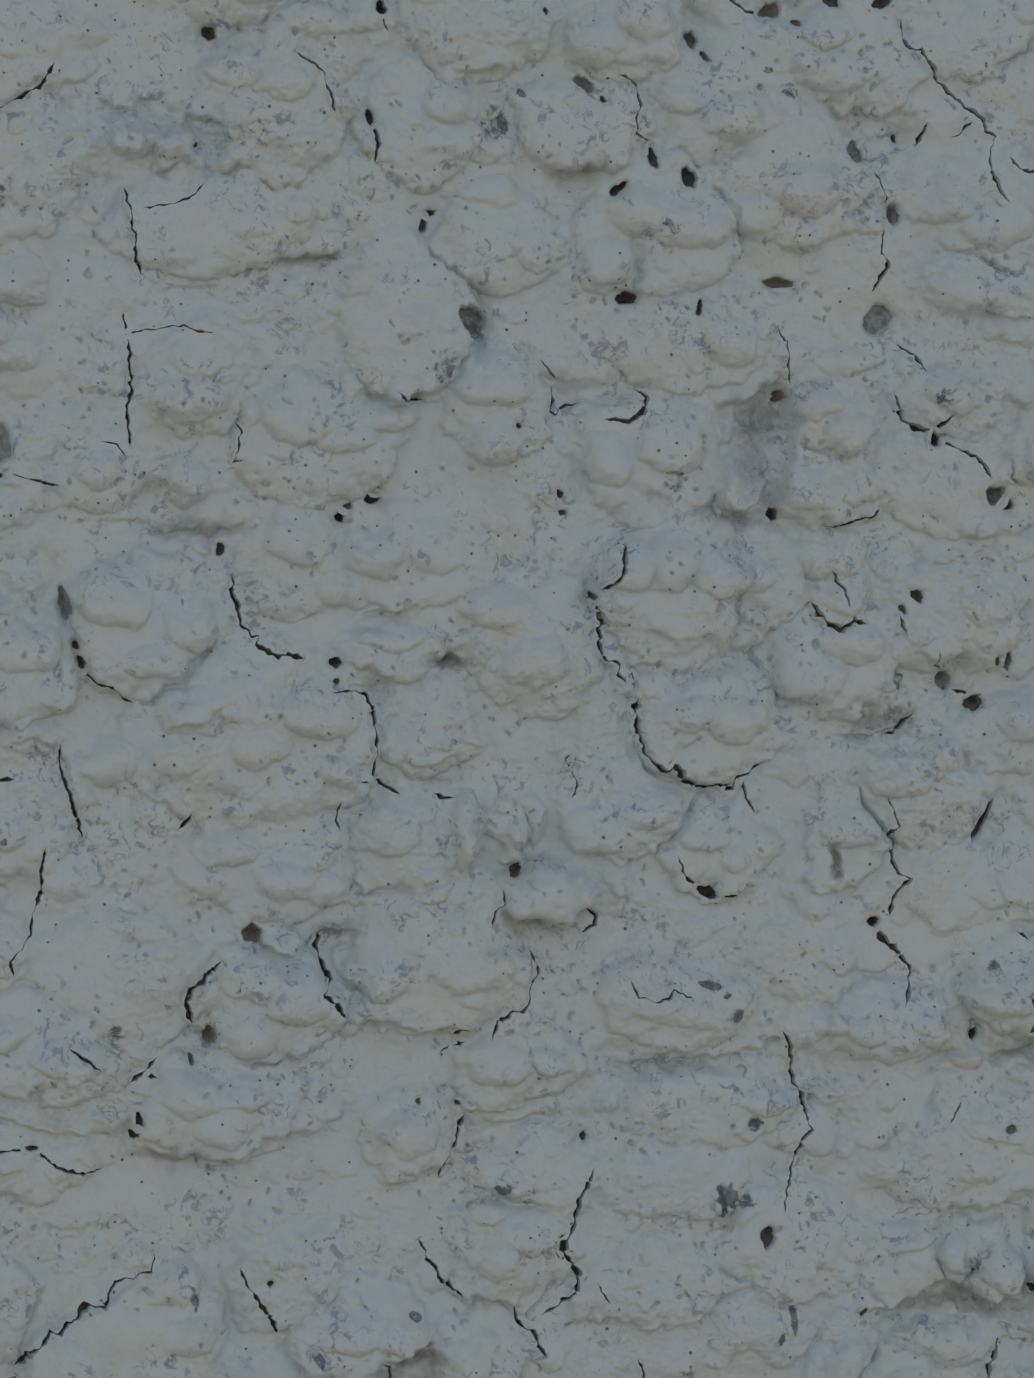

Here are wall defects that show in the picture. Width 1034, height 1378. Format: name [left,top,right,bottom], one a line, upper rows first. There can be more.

crack [896,18,1034,205]
crack [100,312,214,459]
crack [888,341,995,480]
crack [223,573,304,666]
crack [329,684,457,832]
crack [589,544,765,816]
crack [3,744,88,977]
crack [307,931,349,1021]
crack [873,796,919,1010]
crack [778,1029,819,1214]
crack [3,1251,161,1378]
crack [507,1165,614,1359]